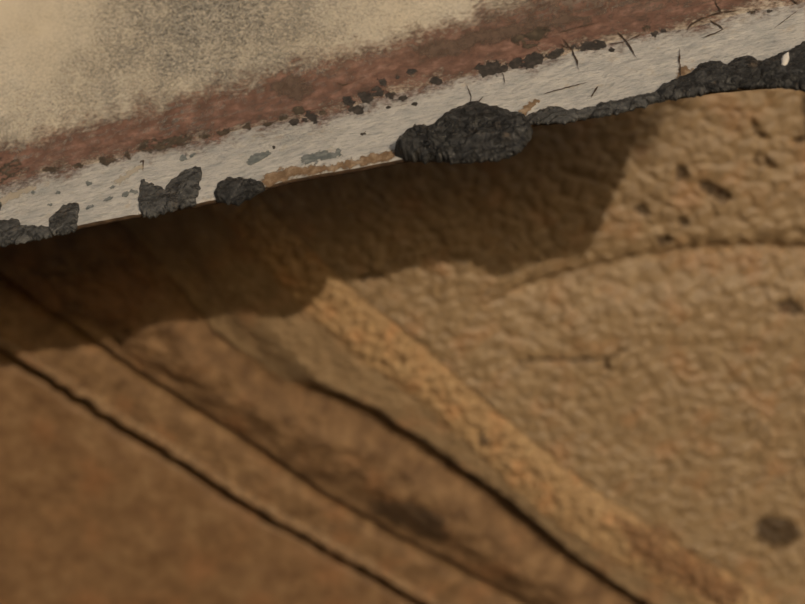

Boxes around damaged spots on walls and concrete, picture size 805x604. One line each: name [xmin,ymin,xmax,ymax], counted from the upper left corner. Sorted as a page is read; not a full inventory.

damp [116,0,288,80]
damp [415,10,615,78]
damp [263,74,328,126]
damp [342,69,418,115]
rust [518,99,540,115]
peeling [104,153,202,219]
damp [99,129,231,166]
peeling [214,177,266,207]
rust [261,150,395,187]
peeling [0,202,94,248]
crack [519,347,632,368]
peeling [0,341,436,604]